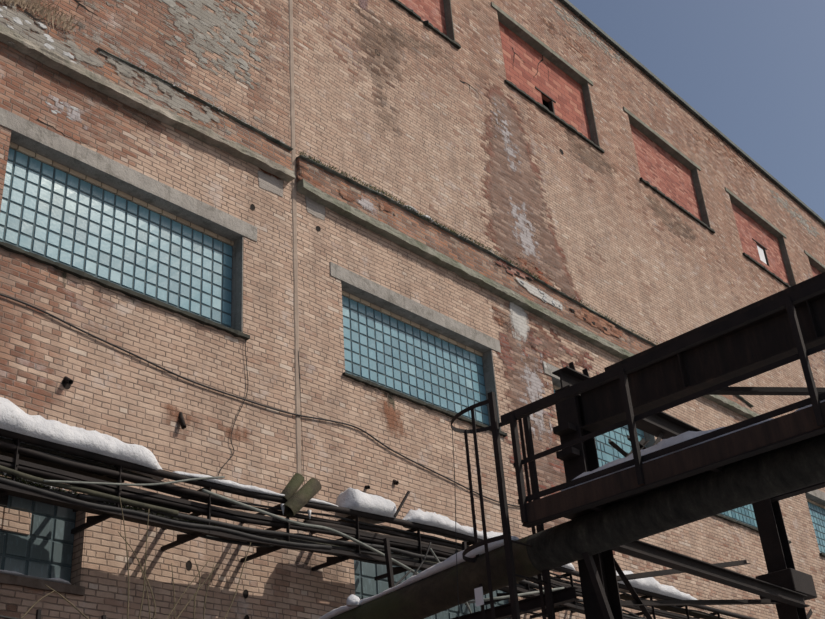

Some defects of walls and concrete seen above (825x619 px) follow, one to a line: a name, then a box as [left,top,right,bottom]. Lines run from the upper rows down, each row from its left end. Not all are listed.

peeling [0,2,232,135]
peeling [158,0,268,93]
damp [359,0,435,106]
damp [481,84,581,302]
efflorescence [510,302,530,341]